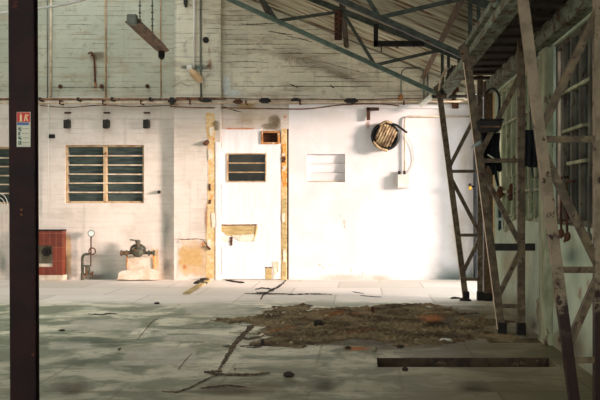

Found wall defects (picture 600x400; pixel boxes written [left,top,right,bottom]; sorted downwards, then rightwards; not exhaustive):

peeling [205,112,258,279]
crack [163,280,332,393]